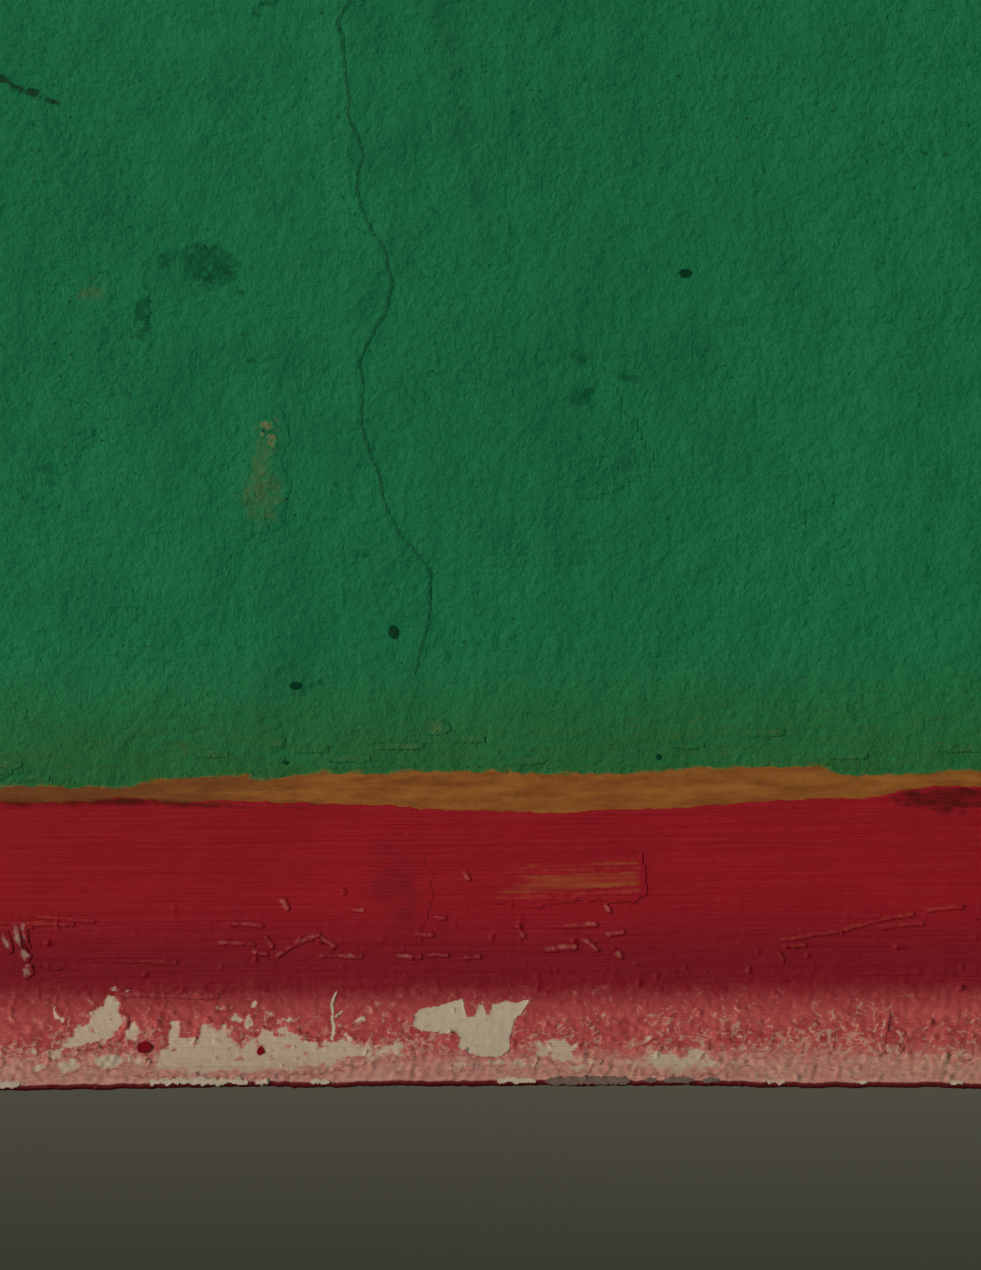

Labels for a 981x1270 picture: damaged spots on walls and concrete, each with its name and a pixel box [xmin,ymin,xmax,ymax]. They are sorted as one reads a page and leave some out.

crack [334,0,432,674]
peeling [0,919,34,979]
peeling [0,982,747,1089]